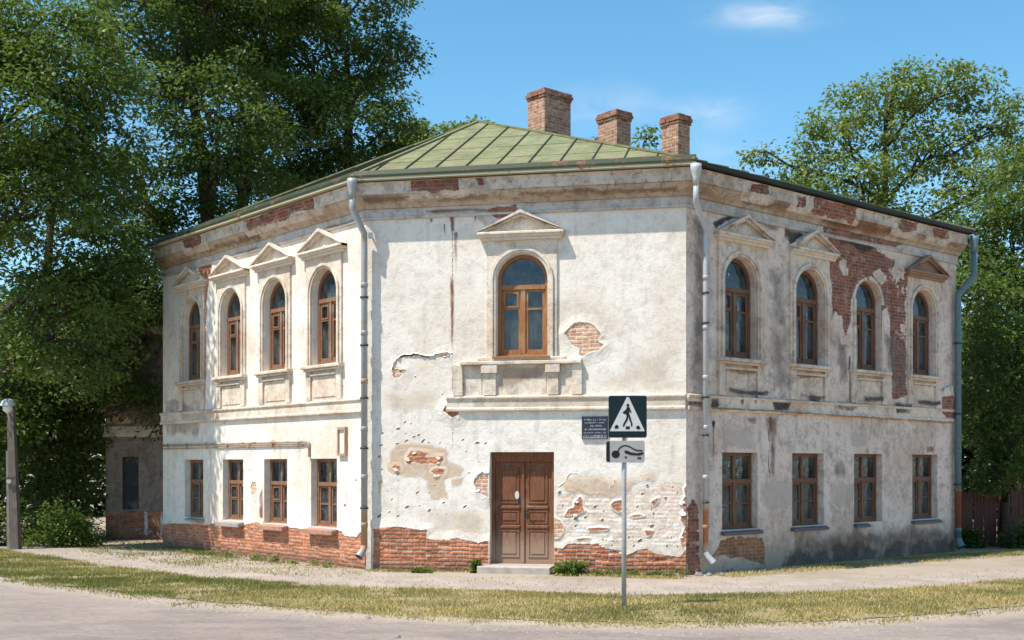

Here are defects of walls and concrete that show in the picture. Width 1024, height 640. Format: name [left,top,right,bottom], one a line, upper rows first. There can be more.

flaking render [243,196,323,237]
flaking render [402,177,526,227]
flaking render [740,180,776,206]
flaking render [787,192,953,406]
flaking render [428,344,460,369]
flaking render [557,313,613,367]
flaking render [162,420,490,572]
peeling [554,472,772,575]